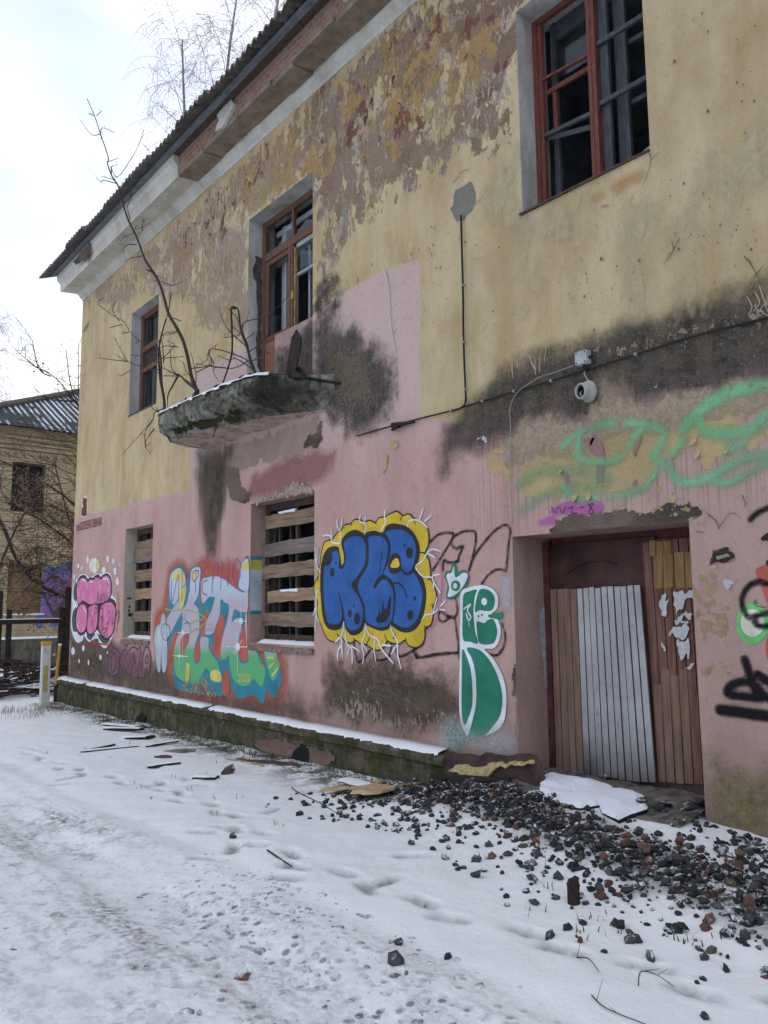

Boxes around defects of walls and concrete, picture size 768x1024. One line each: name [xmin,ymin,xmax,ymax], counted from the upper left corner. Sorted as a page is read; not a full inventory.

peeling [85,0,523,371]
damp [166,409,243,441]
damp [198,448,231,554]
spalling [226,466,313,506]
mould [245,276,393,437]
damp [443,281,768,470]
peeling [477,389,768,533]
damp [323,659,459,744]